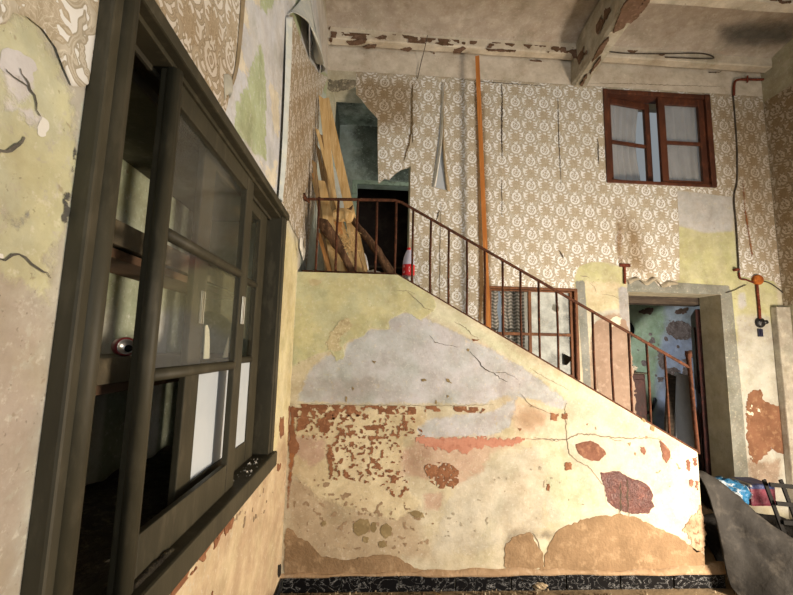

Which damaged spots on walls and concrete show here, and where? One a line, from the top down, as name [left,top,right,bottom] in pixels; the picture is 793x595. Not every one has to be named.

flaking render [0,48,37,87]
peeling [328,26,477,54]
peeling [486,0,650,86]
crack [0,137,25,153]
crack [0,253,51,278]
flaking render [649,307,693,382]
peeling [453,406,485,414]
crack [455,322,660,484]
flaking render [745,389,784,464]
flaking render [274,387,441,578]
peeling [424,462,459,489]
flaking render [504,471,707,571]